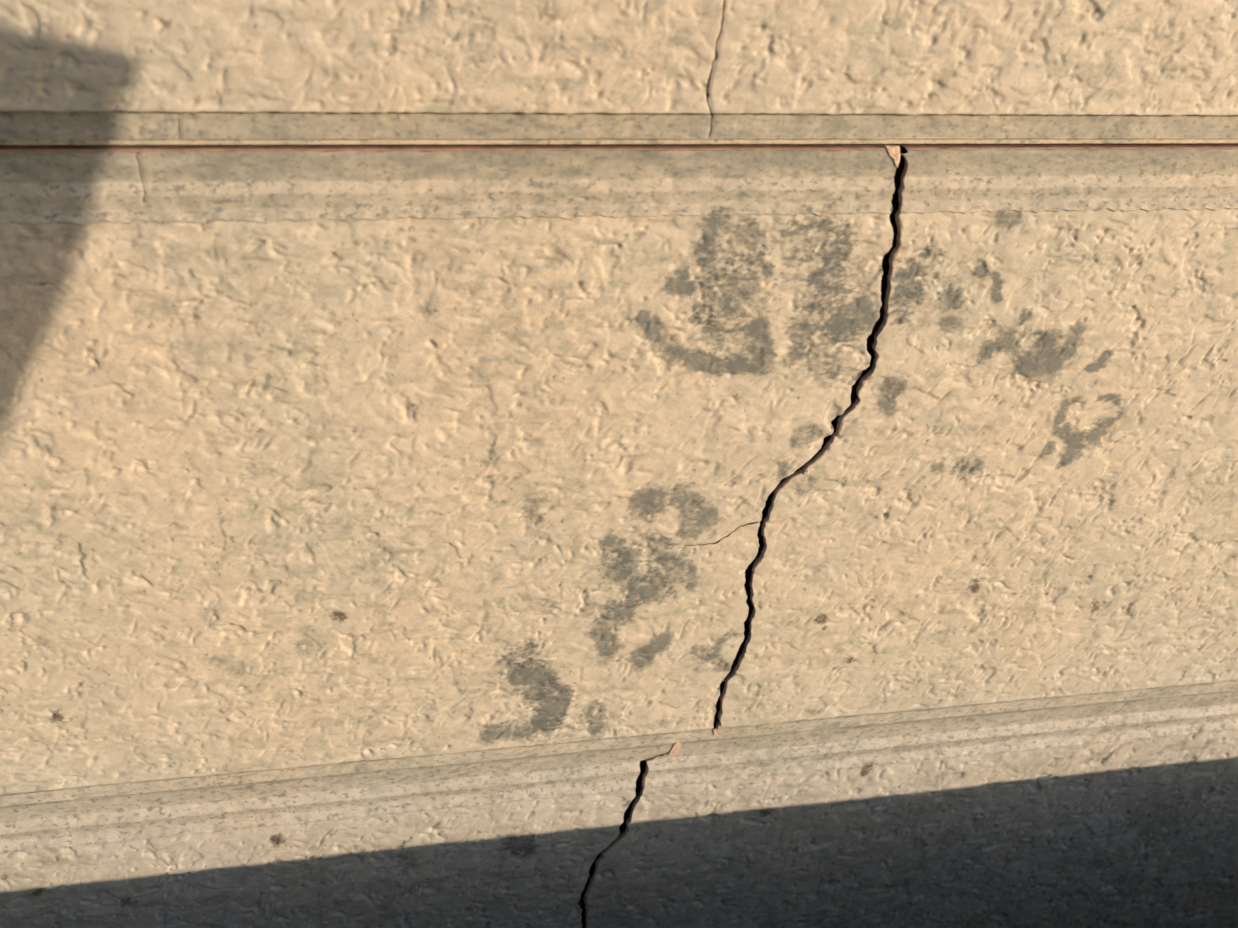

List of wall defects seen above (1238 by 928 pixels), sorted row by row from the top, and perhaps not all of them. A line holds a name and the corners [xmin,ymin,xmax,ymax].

crack [685,144,908,728]
crack [577,751,670,928]